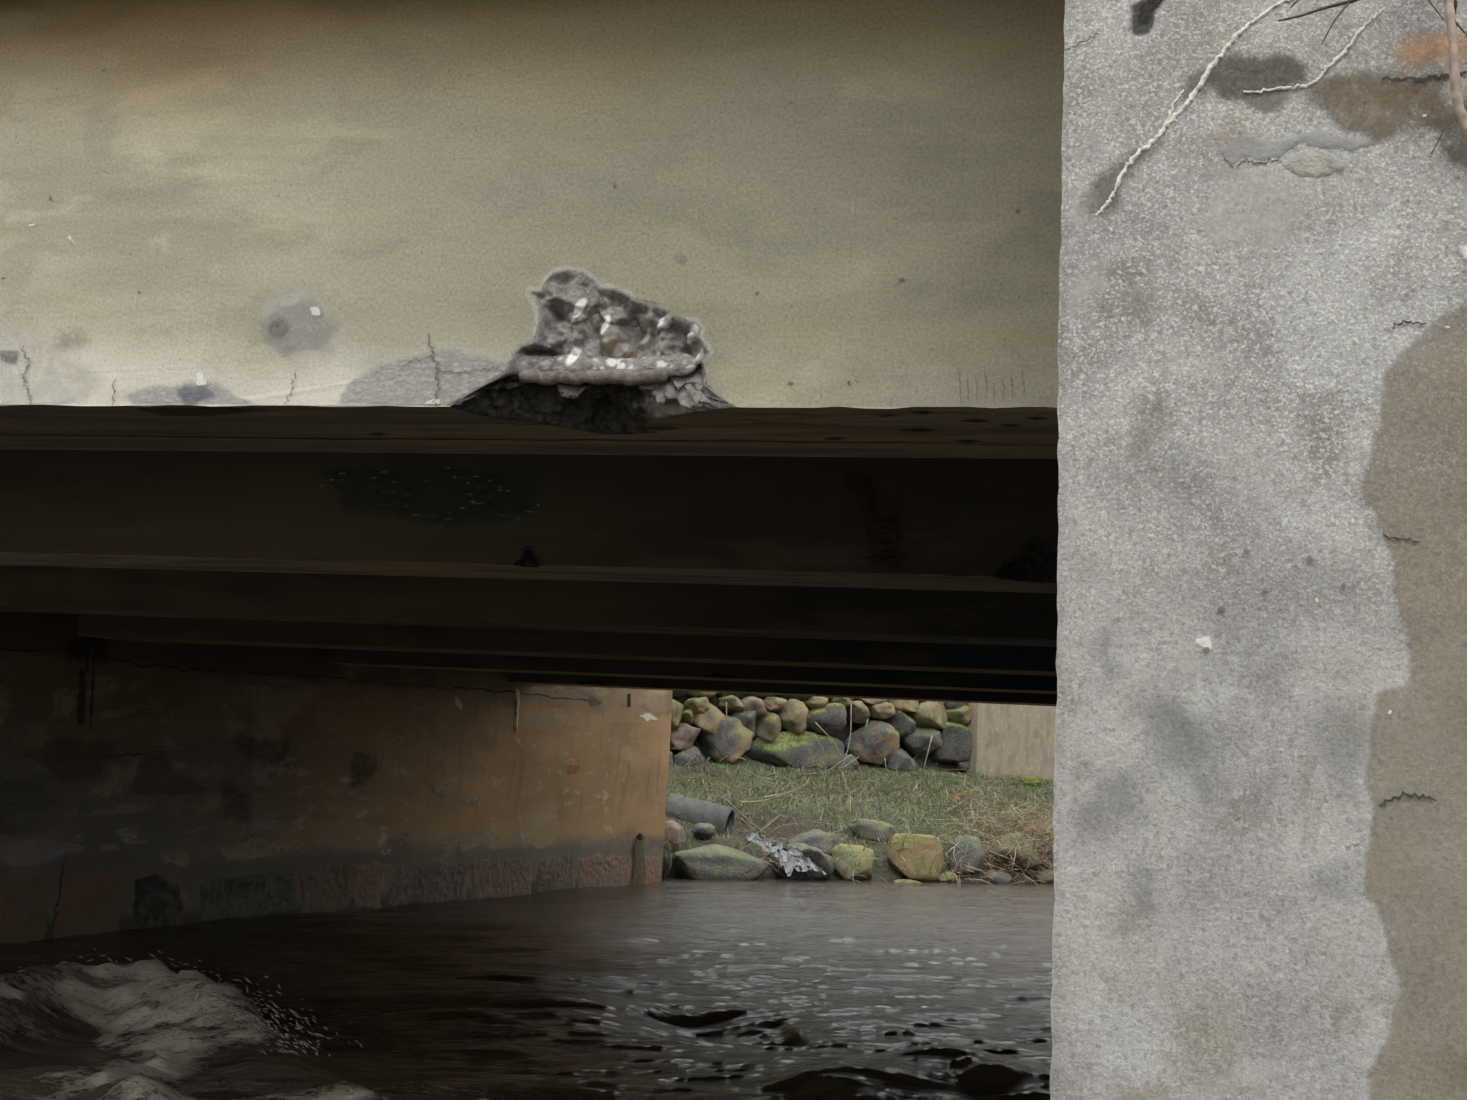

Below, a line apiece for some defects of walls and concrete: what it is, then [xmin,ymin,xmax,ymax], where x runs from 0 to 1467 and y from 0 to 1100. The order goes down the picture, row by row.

leakage [1210,55,1305,109]
leakage [1409,79,1467,163]
crack [21,345,32,405]
crack [402,333,499,408]
spalling [447,266,737,435]
leakage [1366,333,1467,902]
crack [1378,791,1437,807]